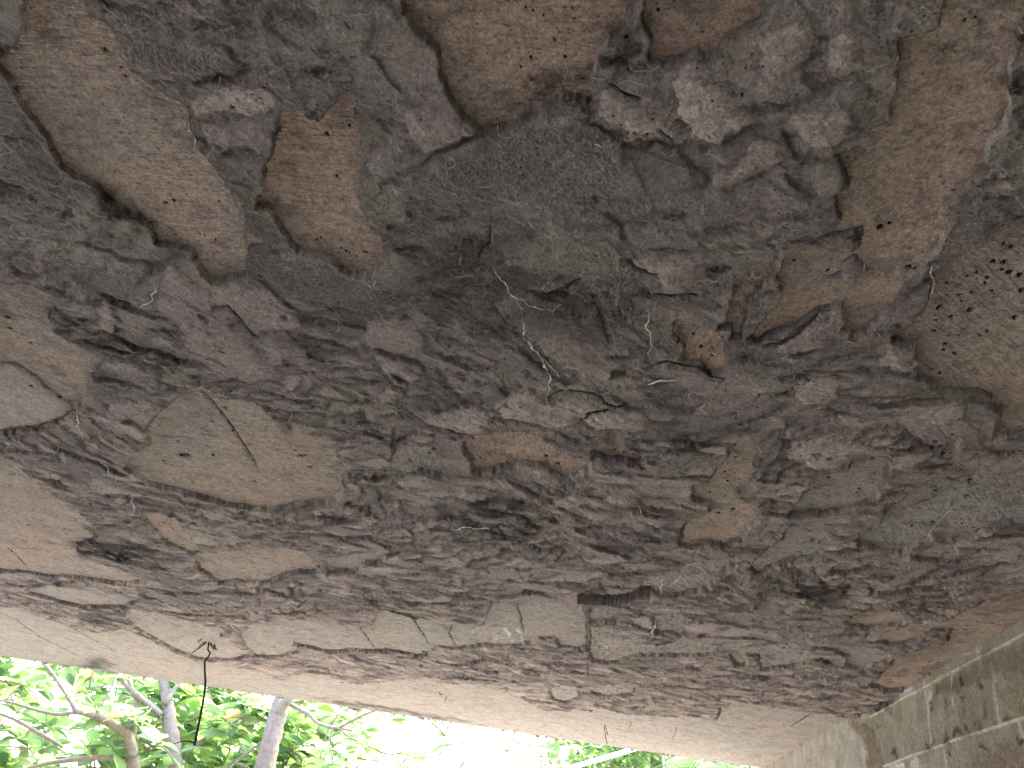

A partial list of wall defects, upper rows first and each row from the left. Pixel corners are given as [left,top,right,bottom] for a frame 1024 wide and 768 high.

peeling [405,0,631,127]
peeling [0,0,248,280]
peeling [258,96,384,273]
peeling [753,0,1024,337]
peeling [0,283,101,411]
peeling [673,318,727,371]
peeling [892,236,1024,434]
crack [201,390,257,465]
peeling [127,386,346,508]
peeling [465,430,641,475]
peeling [0,442,857,768]
peeling [826,590,1024,688]